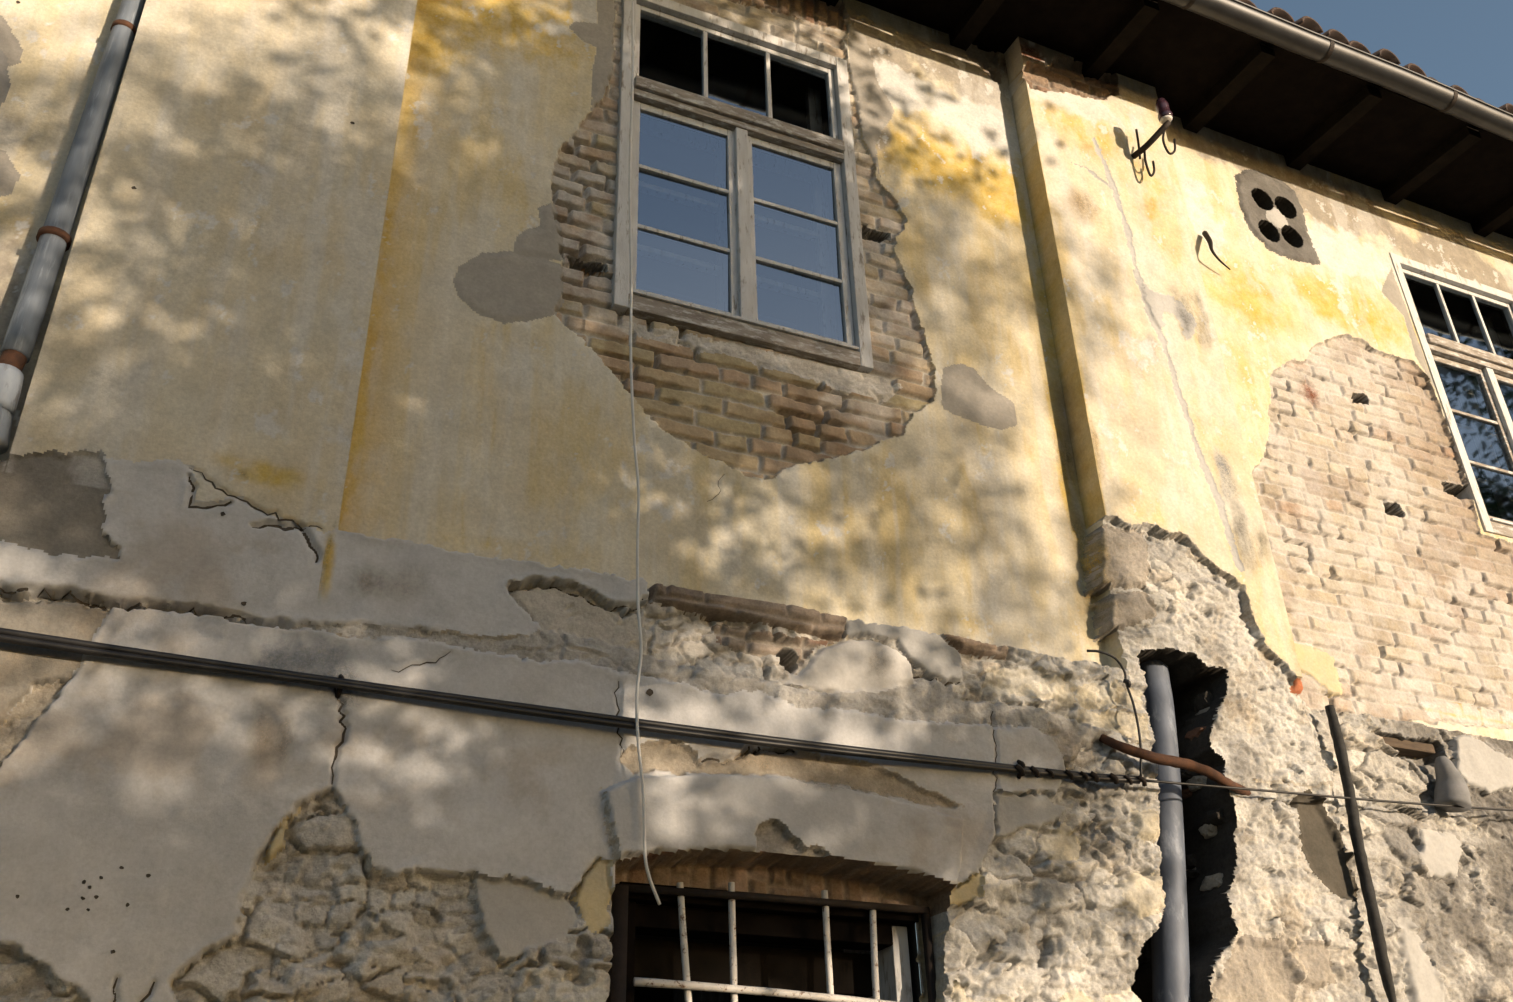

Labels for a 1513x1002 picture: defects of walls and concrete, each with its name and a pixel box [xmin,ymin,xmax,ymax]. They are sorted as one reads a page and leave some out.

spalling [551,0,937,480]
crack [188,468,322,563]
flaking render [0,591,287,630]
flaking render [649,628,818,691]
spalling [835,333,1513,1002]
flaking render [0,679,67,767]
crack [331,688,347,785]
spalling [620,739,965,809]
spalling [754,818,831,857]
flaking render [172,787,621,1002]
flaking render [0,944,90,1002]